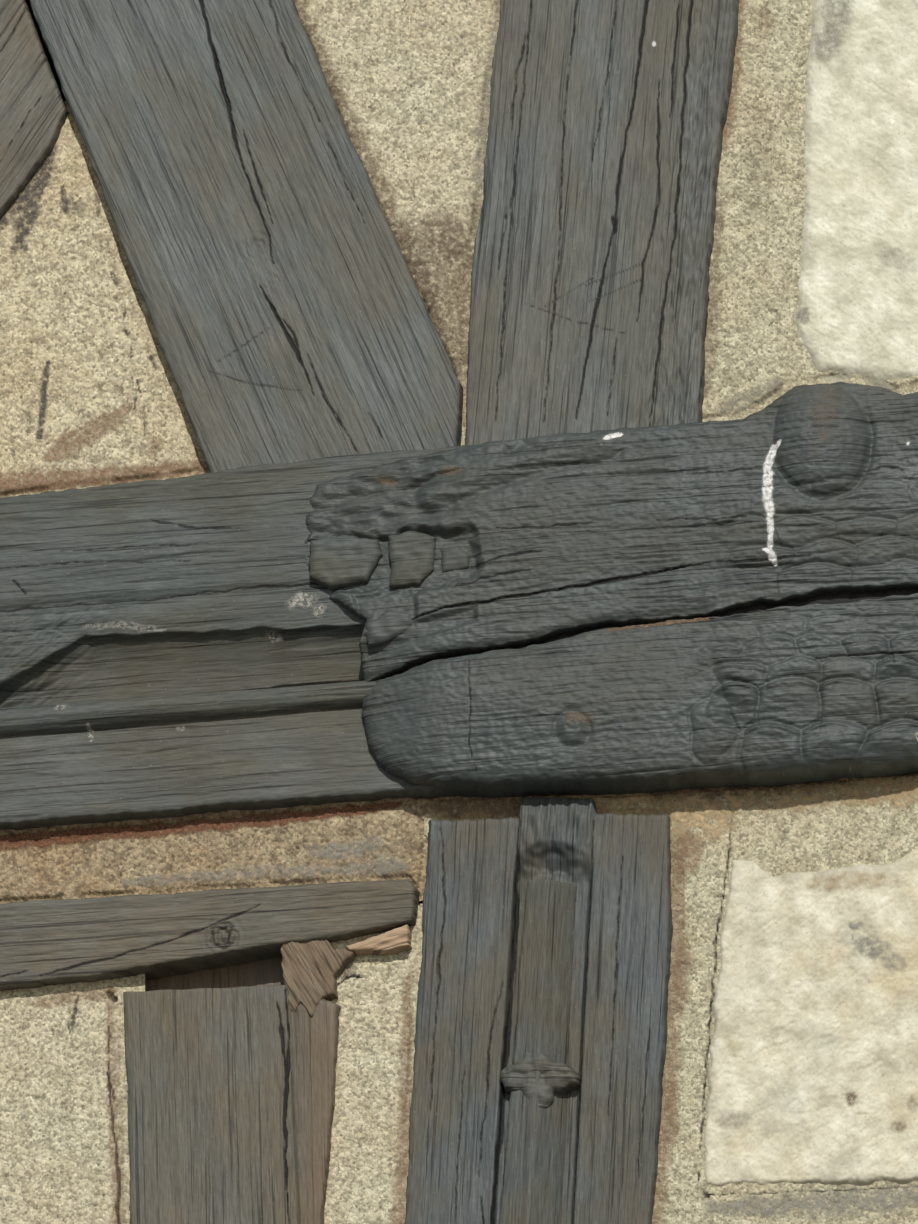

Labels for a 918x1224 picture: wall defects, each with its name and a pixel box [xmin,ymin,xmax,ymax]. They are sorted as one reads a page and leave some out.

crack [199,0,382,451]
crack [496,0,532,412]
crack [576,0,693,425]
crack [267,587,918,768]
crack [107,1027,121,1224]
crack [0,904,260,977]
crack [277,990,290,1222]
crack [701,813,733,1134]